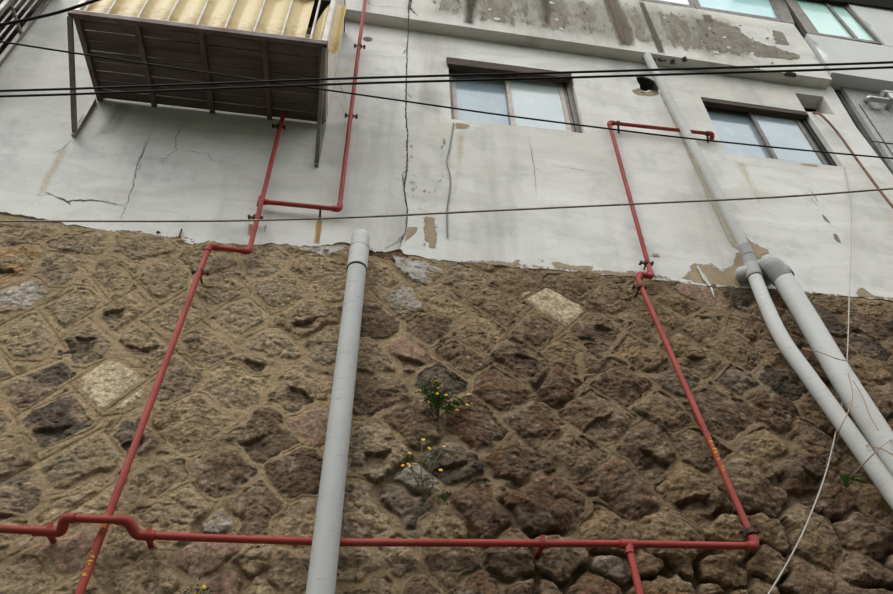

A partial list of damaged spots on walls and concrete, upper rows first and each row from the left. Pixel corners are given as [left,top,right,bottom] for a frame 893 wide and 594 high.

damp [579,0,676,65]
crack [43,111,214,218]
crack [369,0,419,249]
peeling [405,174,443,248]
peeling [633,88,769,287]
peeling [461,258,636,277]